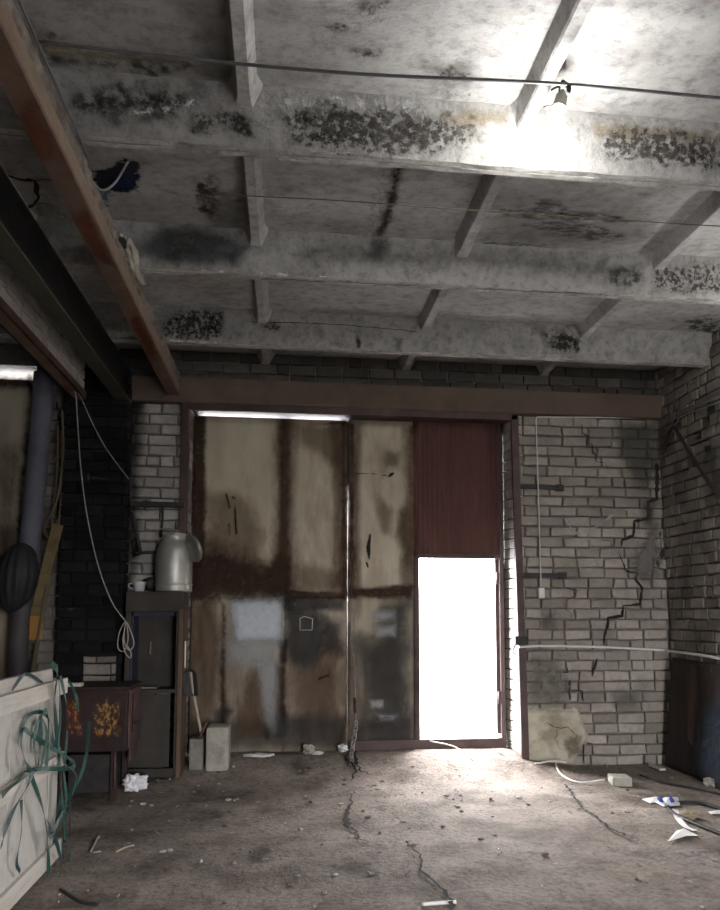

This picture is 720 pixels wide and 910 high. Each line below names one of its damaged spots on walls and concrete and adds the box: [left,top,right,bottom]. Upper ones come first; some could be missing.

damp [72,82,253,136]
damp [278,95,475,159]
damp [603,126,720,171]
damp [364,168,401,236]
damp [655,260,720,293]
damp [163,309,223,341]
corrosion [190,415,415,735]
crack [560,463,660,700]
crack [548,723,593,761]
crack [343,748,383,842]
crack [564,784,643,849]
crack [412,848,456,908]